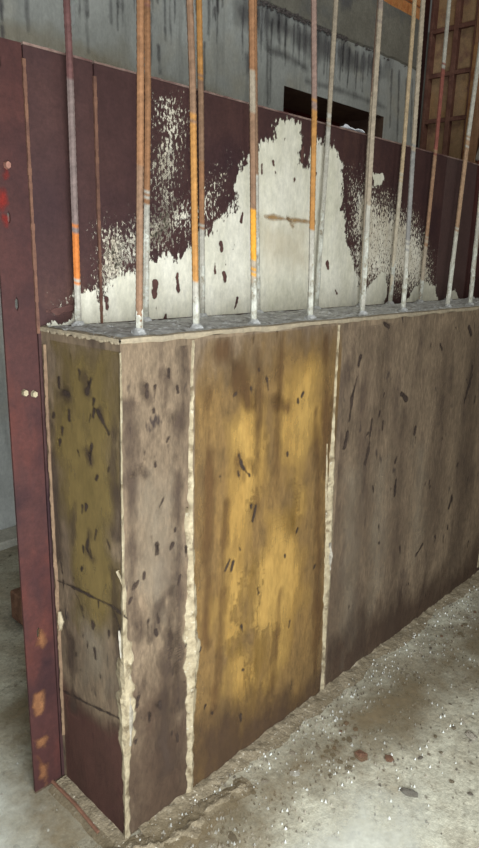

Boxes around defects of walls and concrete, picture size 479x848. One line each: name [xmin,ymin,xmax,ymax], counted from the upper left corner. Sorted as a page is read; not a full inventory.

water stain [239,4,380,78]
water stain [173,402,185,433]
water stain [316,398,330,476]
water stain [126,467,134,513]
water stain [162,624,183,676]
water stain [327,552,479,682]
water stain [289,626,479,781]
water stain [137,684,320,823]
water stain [159,799,262,848]